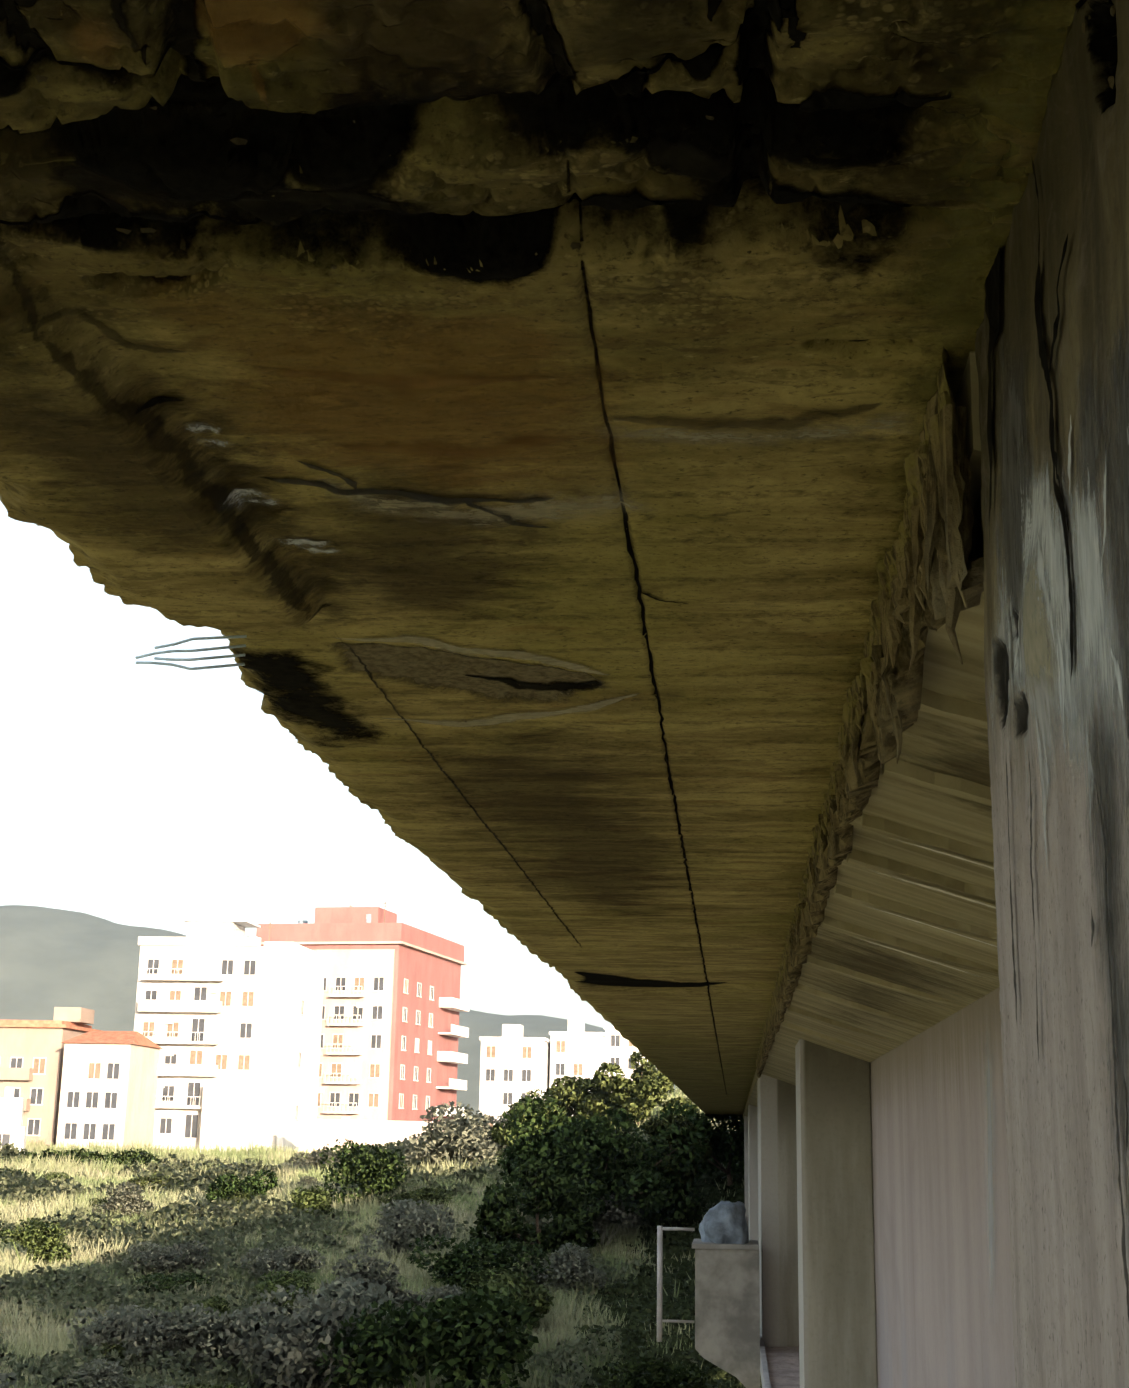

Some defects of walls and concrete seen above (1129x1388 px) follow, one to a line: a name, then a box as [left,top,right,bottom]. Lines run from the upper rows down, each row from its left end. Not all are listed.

water stain [332,0,510,103]
spalling [1075,0,1118,112]
water stain [50,120,412,226]
water stain [616,93,747,207]
crack [964,235,1001,535]
crack [1032,160,1073,679]
crack [0,0,954,1095]
water stain [232,648,384,747]
spalling [334,636,637,727]
spalling [755,346,984,1078]
spalling [992,609,1029,736]
water stain [995,330,1129,1153]